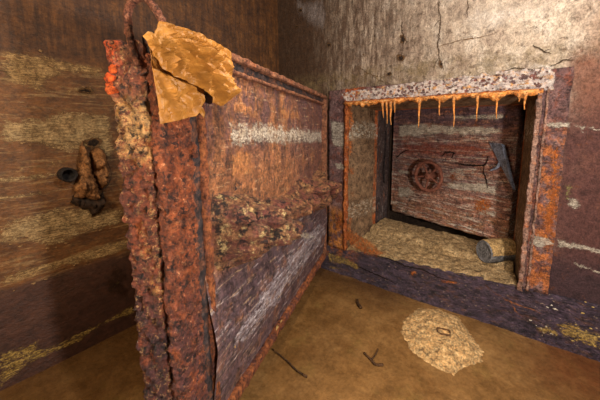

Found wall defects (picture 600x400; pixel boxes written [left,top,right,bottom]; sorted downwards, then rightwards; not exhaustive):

crack [434,3,487,69]
rust [344,89,544,131]
leakage [229,123,321,147]
crack [443,151,488,188]